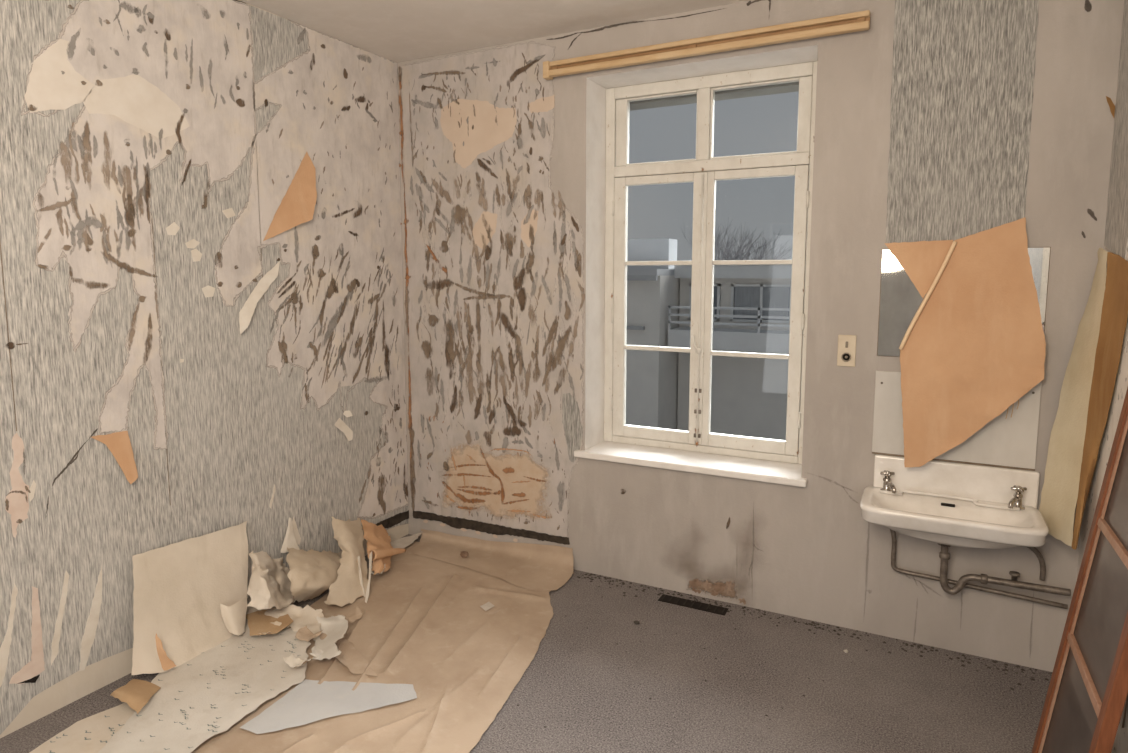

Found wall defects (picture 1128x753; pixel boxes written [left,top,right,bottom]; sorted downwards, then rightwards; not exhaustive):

peeling [21,0,585,537]
flaking render [688,579,746,605]